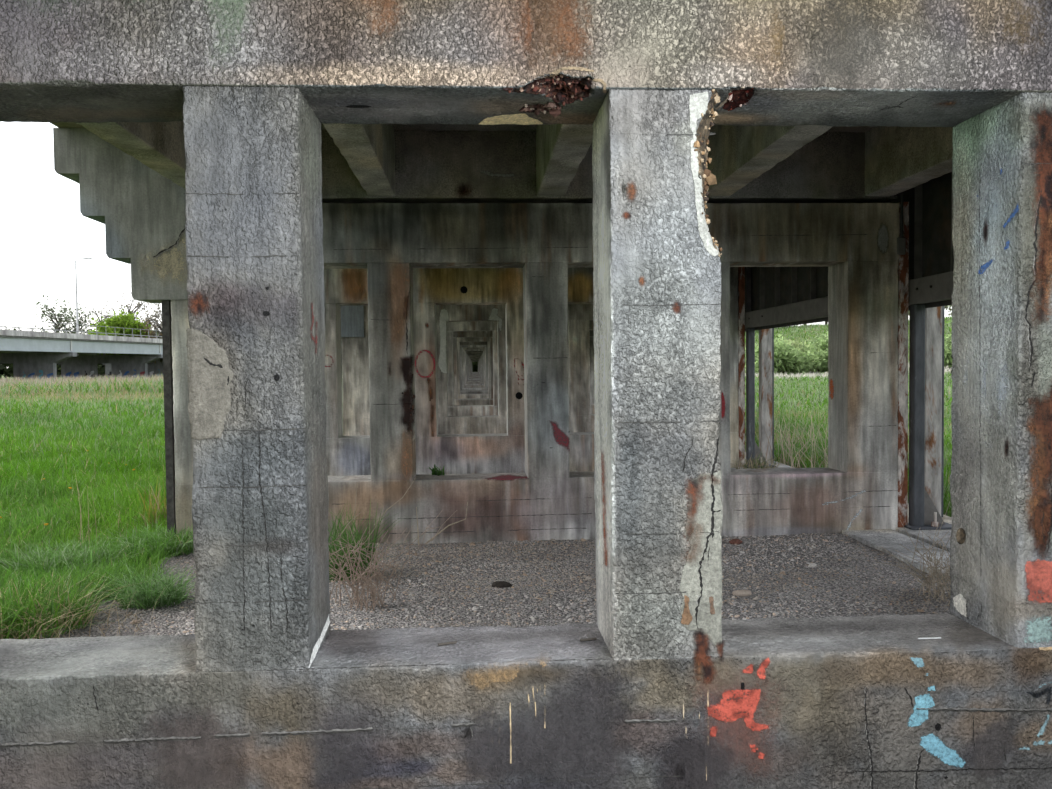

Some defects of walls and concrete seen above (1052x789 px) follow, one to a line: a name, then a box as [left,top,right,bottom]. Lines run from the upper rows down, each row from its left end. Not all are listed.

spalling [479,66,607,125]
spalling [689,87,755,257]
crack [1024,190,1042,387]
corrosion [1030,109,1052,321]
crack [683,421,722,628]
corrosion [1029,386,1052,557]
corrosion [694,629,724,683]
crack [841,687,1052,789]